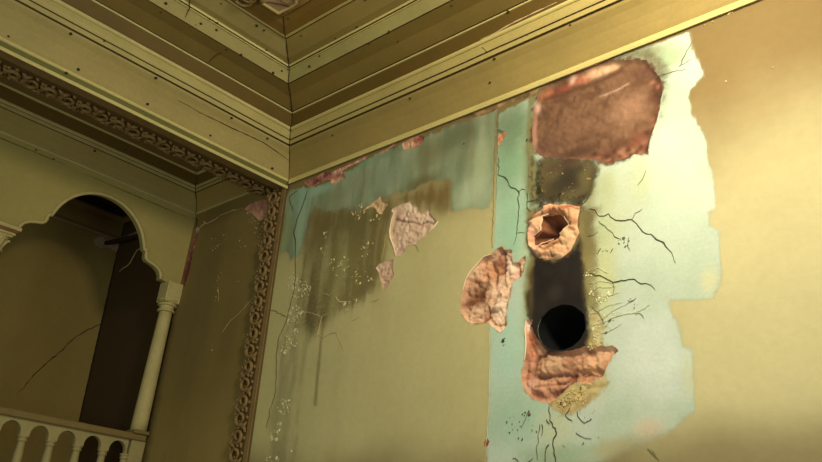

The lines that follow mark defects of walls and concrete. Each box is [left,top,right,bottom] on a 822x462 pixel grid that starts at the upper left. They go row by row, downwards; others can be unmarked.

crack [16,249,118,421]
flaking render [181,200,268,286]
flaking render [305,155,368,187]
damp [268,177,460,462]
flaking render [320,196,438,292]
crack [492,117,538,247]
flaking render [460,183,585,420]
flaking render [462,54,670,192]
flaking render [521,267,649,420]
crack [590,273,654,316]
crack [582,197,676,263]
crack [512,407,592,462]